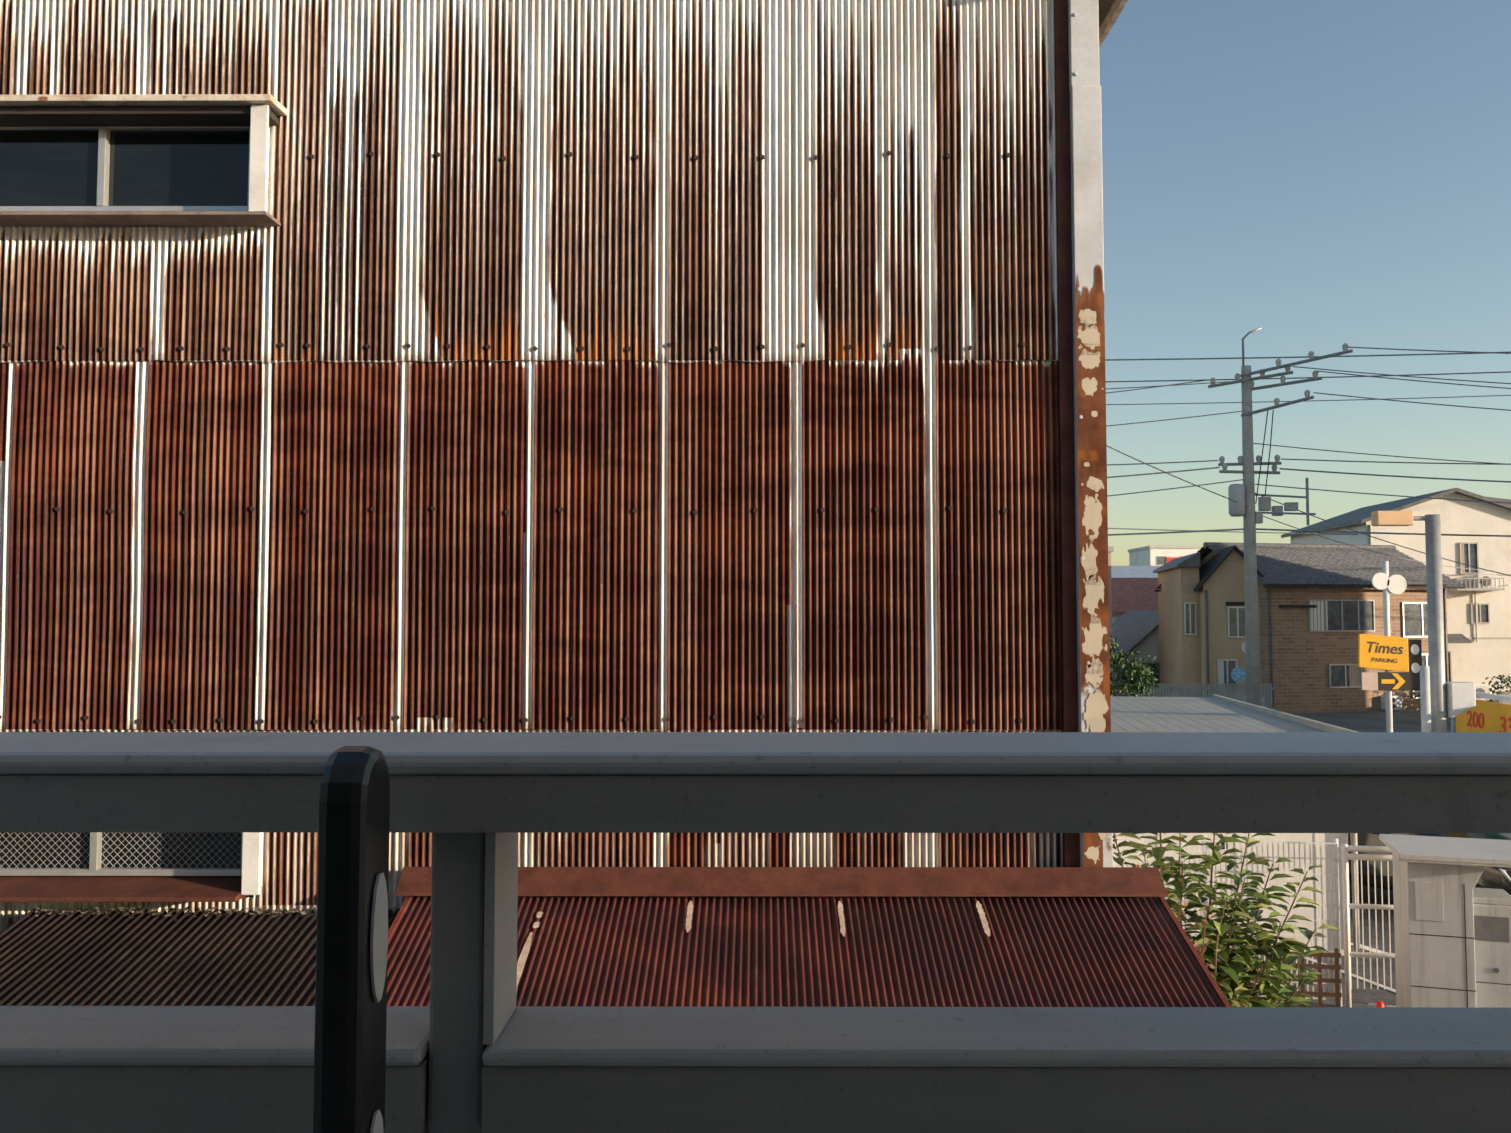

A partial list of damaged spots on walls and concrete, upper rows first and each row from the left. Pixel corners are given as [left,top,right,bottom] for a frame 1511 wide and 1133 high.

corrosion [0,0,1063,732]
corrosion [1076,265,1111,732]
corrosion [407,833,432,867]
corrosion [518,833,791,867]
corrosion [835,833,903,867]
corrosion [938,833,1061,867]
corrosion [1083,833,1111,867]
corrosion [264,832,318,906]